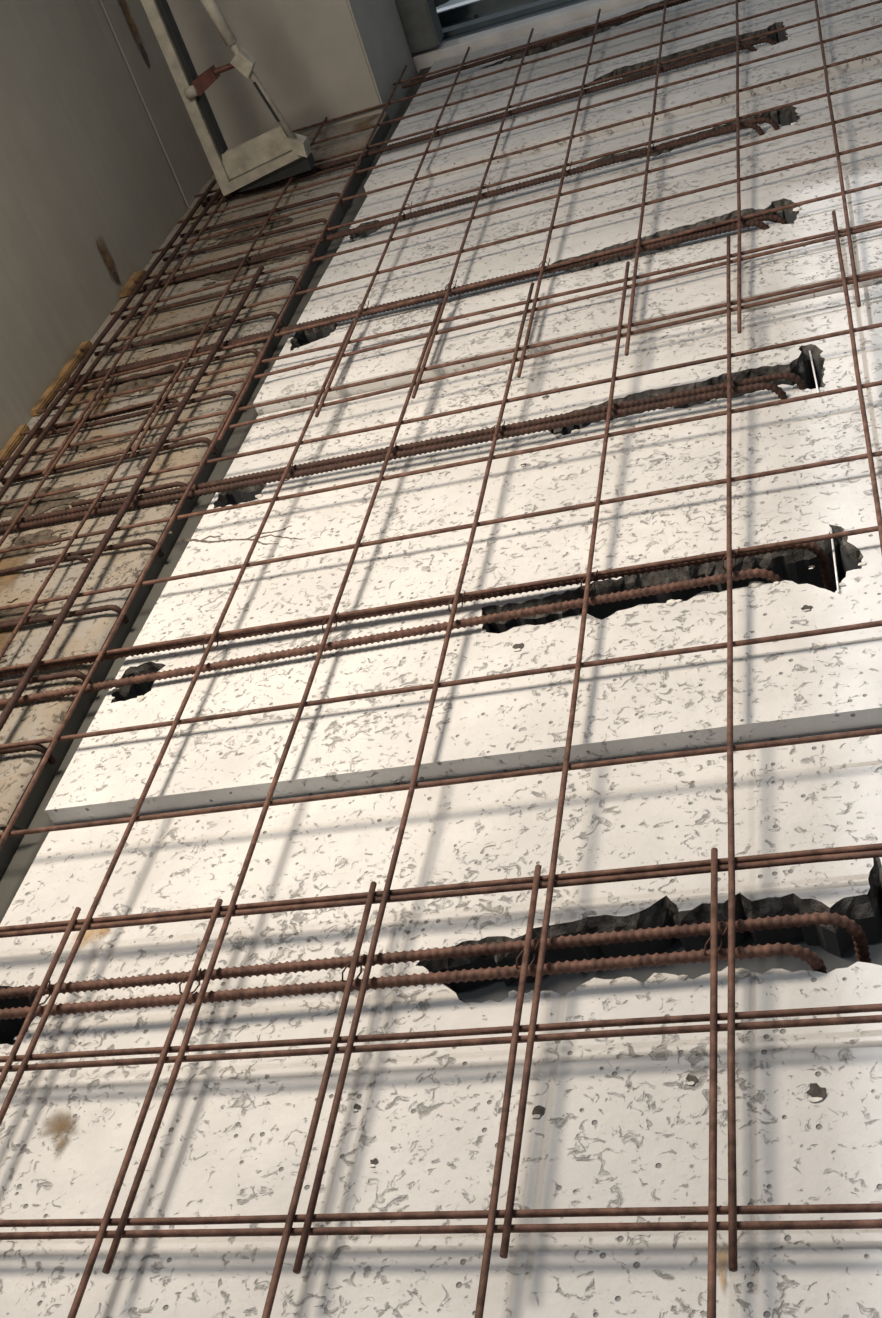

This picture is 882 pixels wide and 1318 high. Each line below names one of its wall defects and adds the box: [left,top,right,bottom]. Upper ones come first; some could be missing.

spalling [479,0,673,70]
spalling [576,21,790,90]
spalling [587,106,800,165]
spalling [552,198,802,273]
spalling [548,344,826,437]
spalling [481,524,866,651]
spalling [109,662,166,703]
spalling [415,857,882,1003]
spalling [0,985,36,1045]